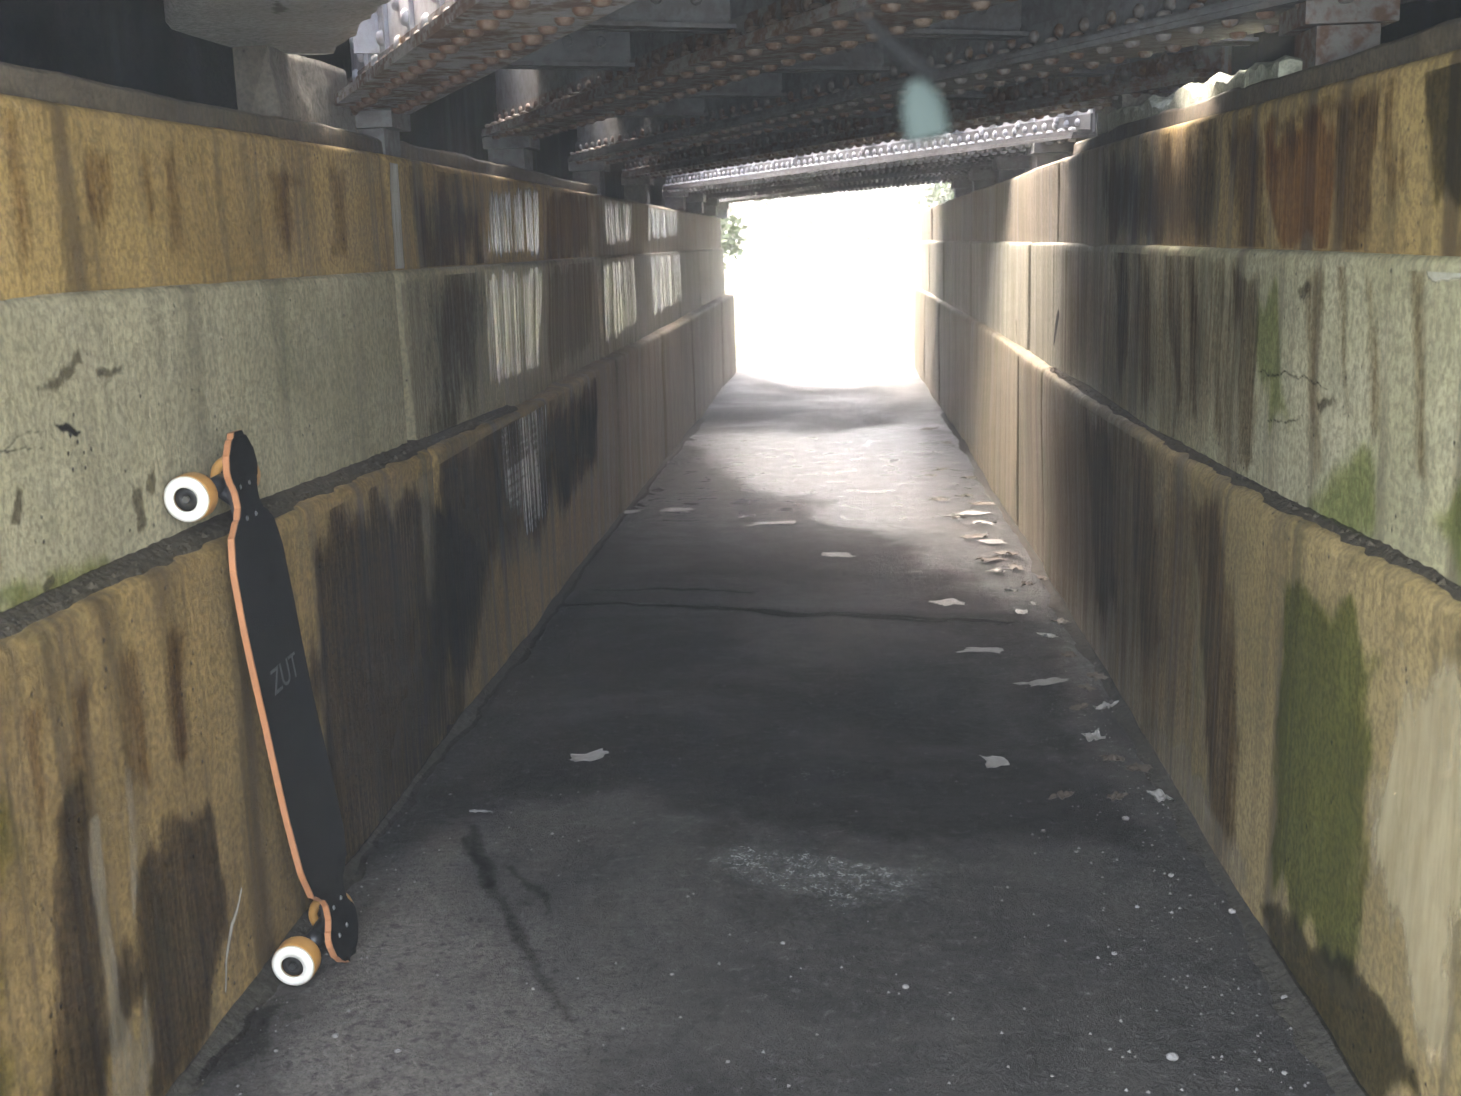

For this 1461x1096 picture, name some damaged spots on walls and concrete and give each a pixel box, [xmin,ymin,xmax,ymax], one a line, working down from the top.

damp [1427,62,1461,202]
damp [420,176,544,424]
damp [312,405,596,866]
crack [559,588,1013,624]
damp [56,779,242,1096]